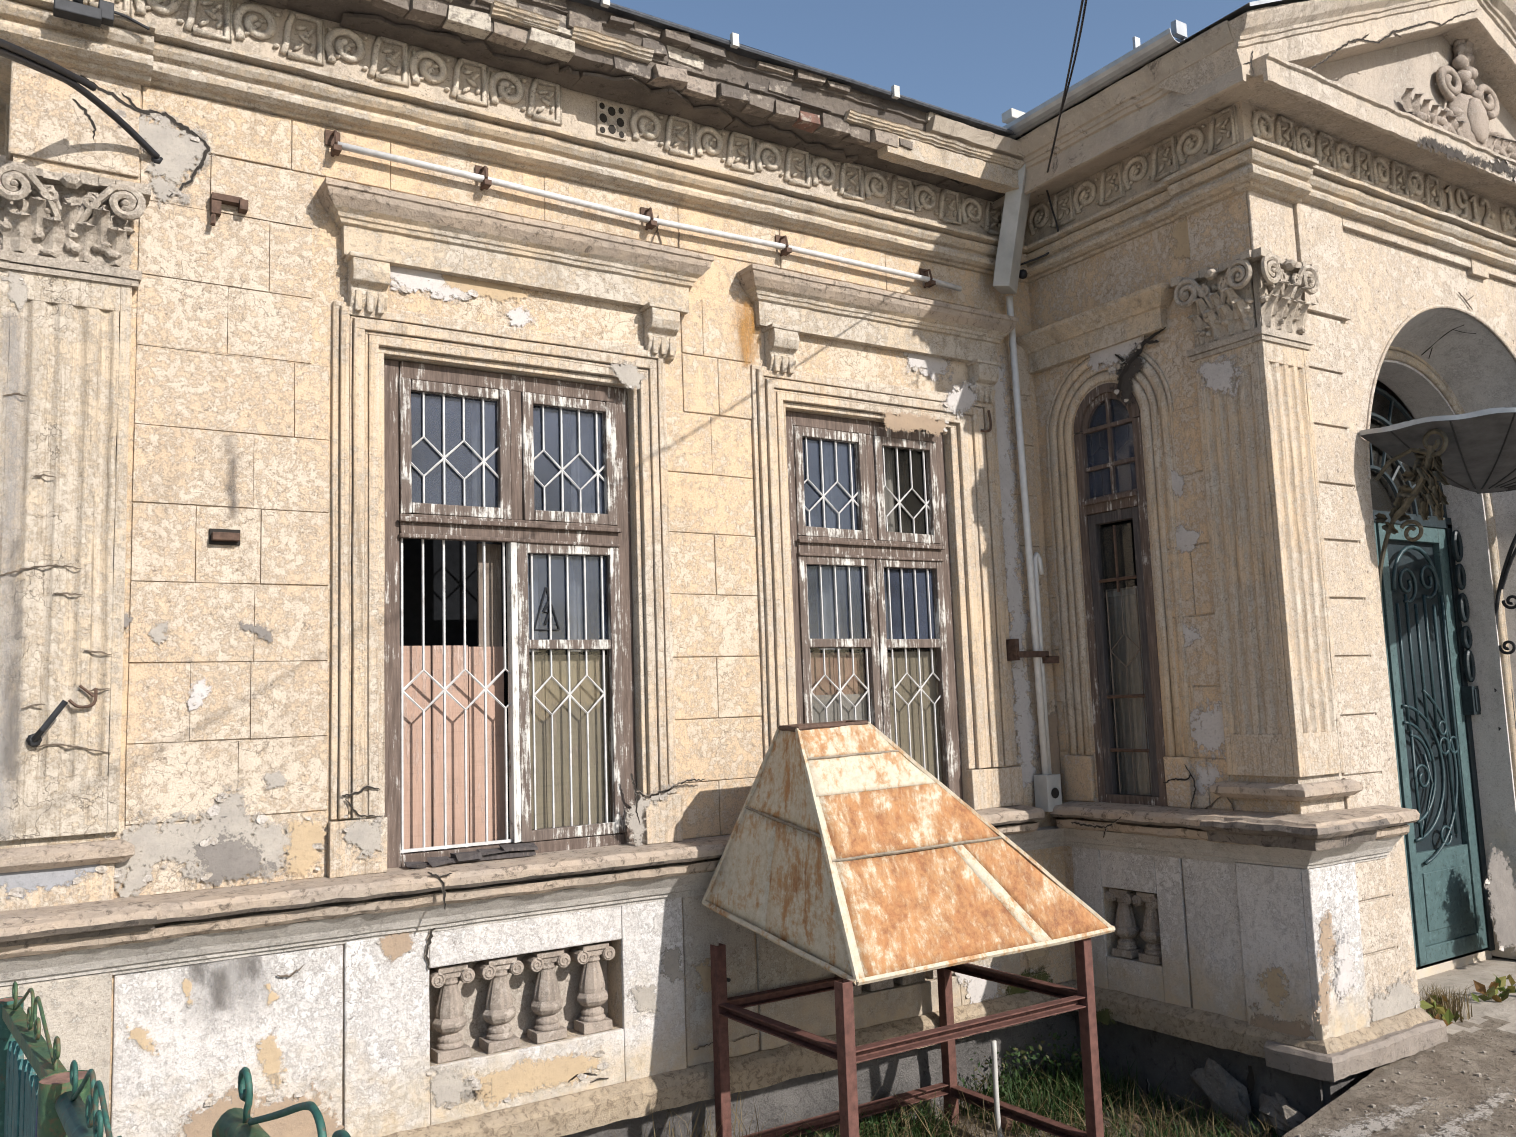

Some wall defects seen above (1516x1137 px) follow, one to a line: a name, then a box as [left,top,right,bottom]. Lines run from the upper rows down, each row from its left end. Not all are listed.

flaking render [366,0,913,150]
crack [1310,9,1478,70]
peeling [114,105,215,208]
peeling [390,266,538,328]
peeling [883,352,1040,796]
peeling [0,770,385,902]
crack [630,773,705,824]
peeling [1484,844,1516,952]